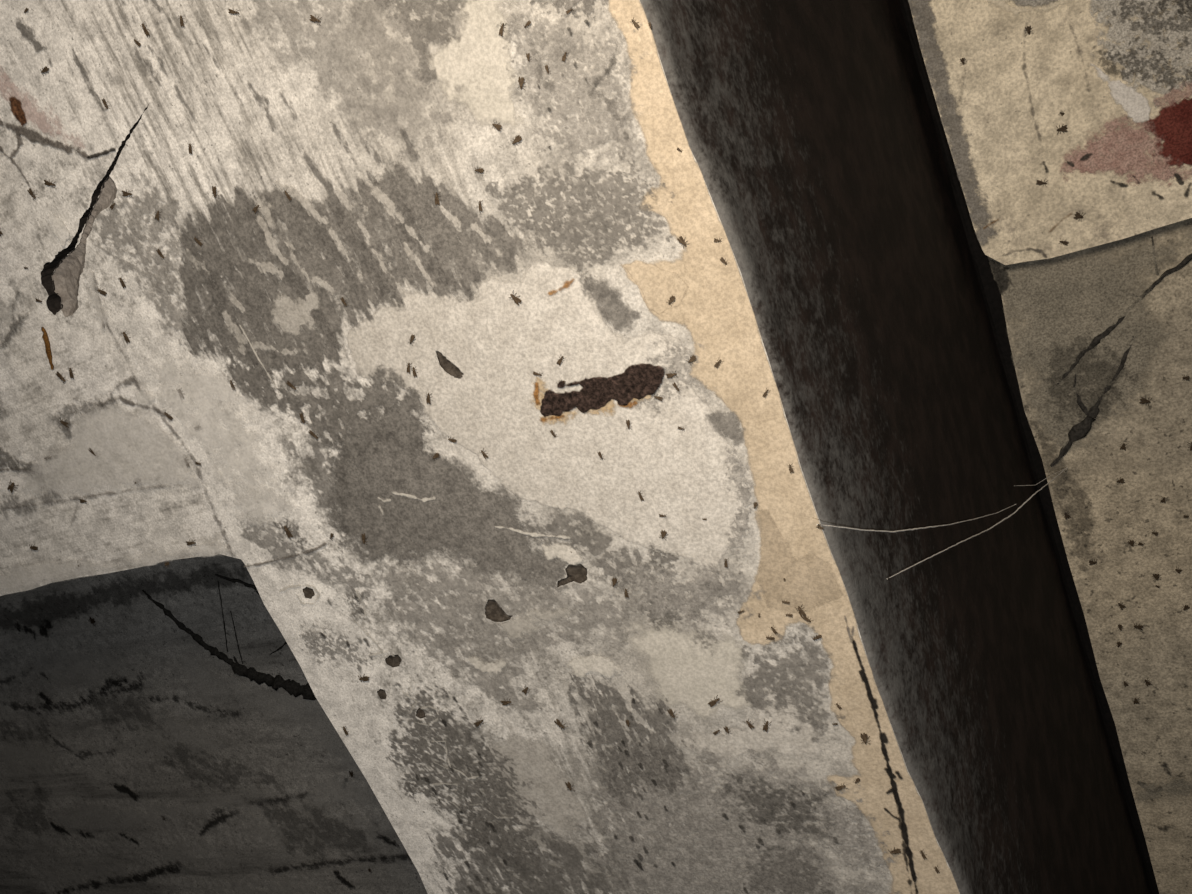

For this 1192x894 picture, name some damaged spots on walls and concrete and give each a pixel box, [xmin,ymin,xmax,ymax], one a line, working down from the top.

crack [0,104,149,317]
peeling [222,198,333,355]
peeling [276,181,353,262]
leakage [92,0,759,712]
corrosion [533,363,664,424]
peeling [336,0,959,894]
leakage [386,655,895,894]
leakage [738,625,843,742]
crack [845,616,918,894]